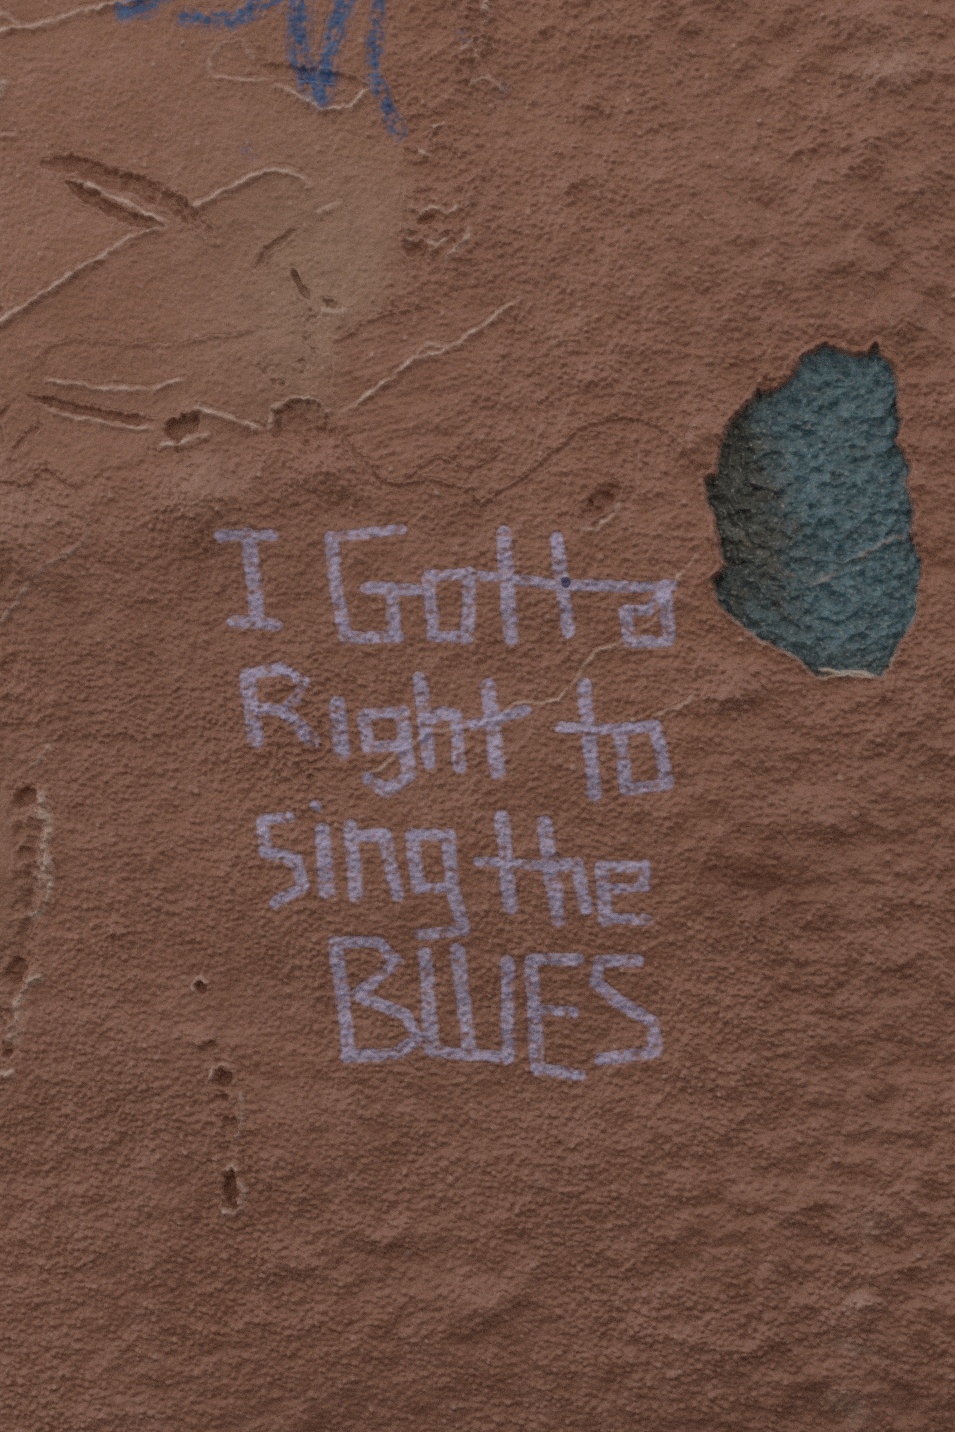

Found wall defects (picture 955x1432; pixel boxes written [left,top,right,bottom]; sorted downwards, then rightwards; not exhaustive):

crack [340,412,705,513]
flaking render [695,335,932,687]